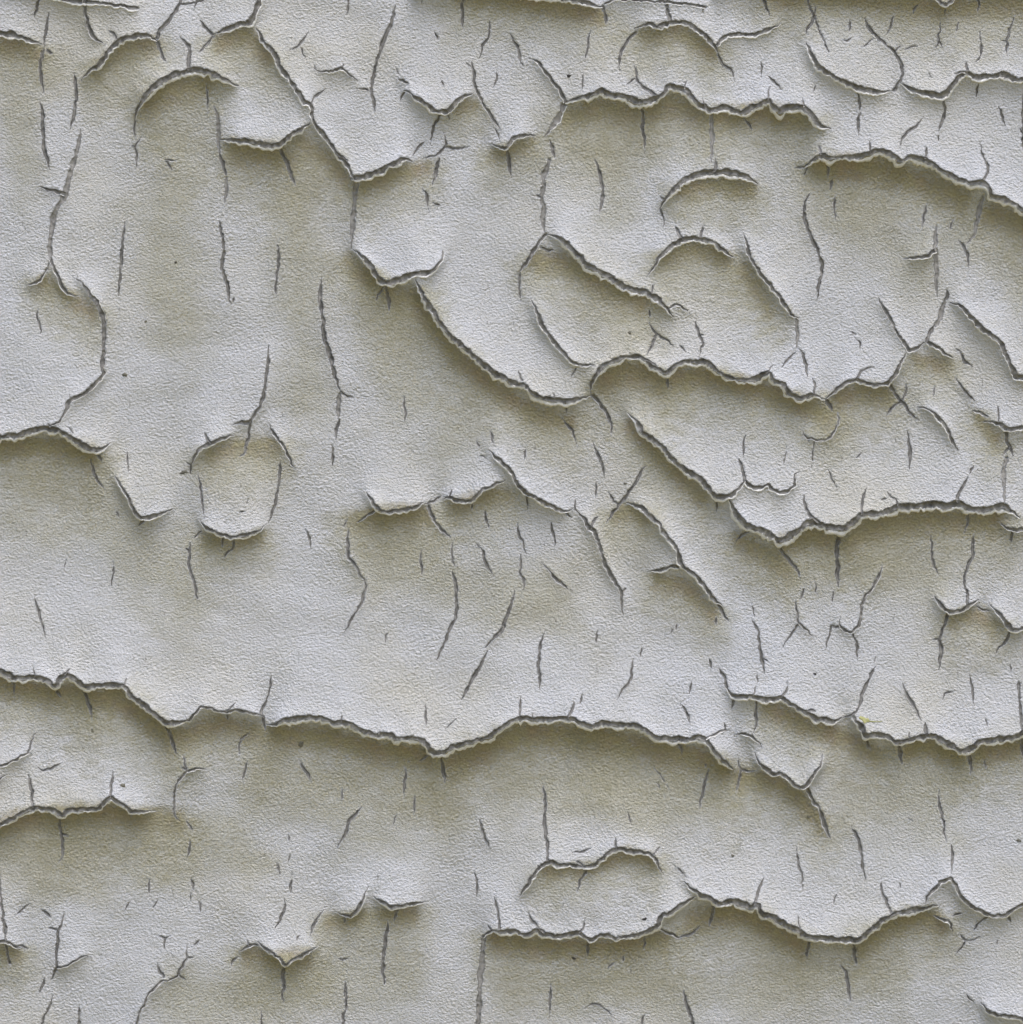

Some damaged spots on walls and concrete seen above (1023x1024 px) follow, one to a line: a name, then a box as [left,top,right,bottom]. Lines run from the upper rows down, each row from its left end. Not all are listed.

crack [0,0,1023,668]
crack [461,527,573,700]
crack [0,606,1023,861]
crack [0,886,92,1024]
crack [136,935,200,1024]
crack [231,834,427,1024]
crack [474,786,1023,1024]